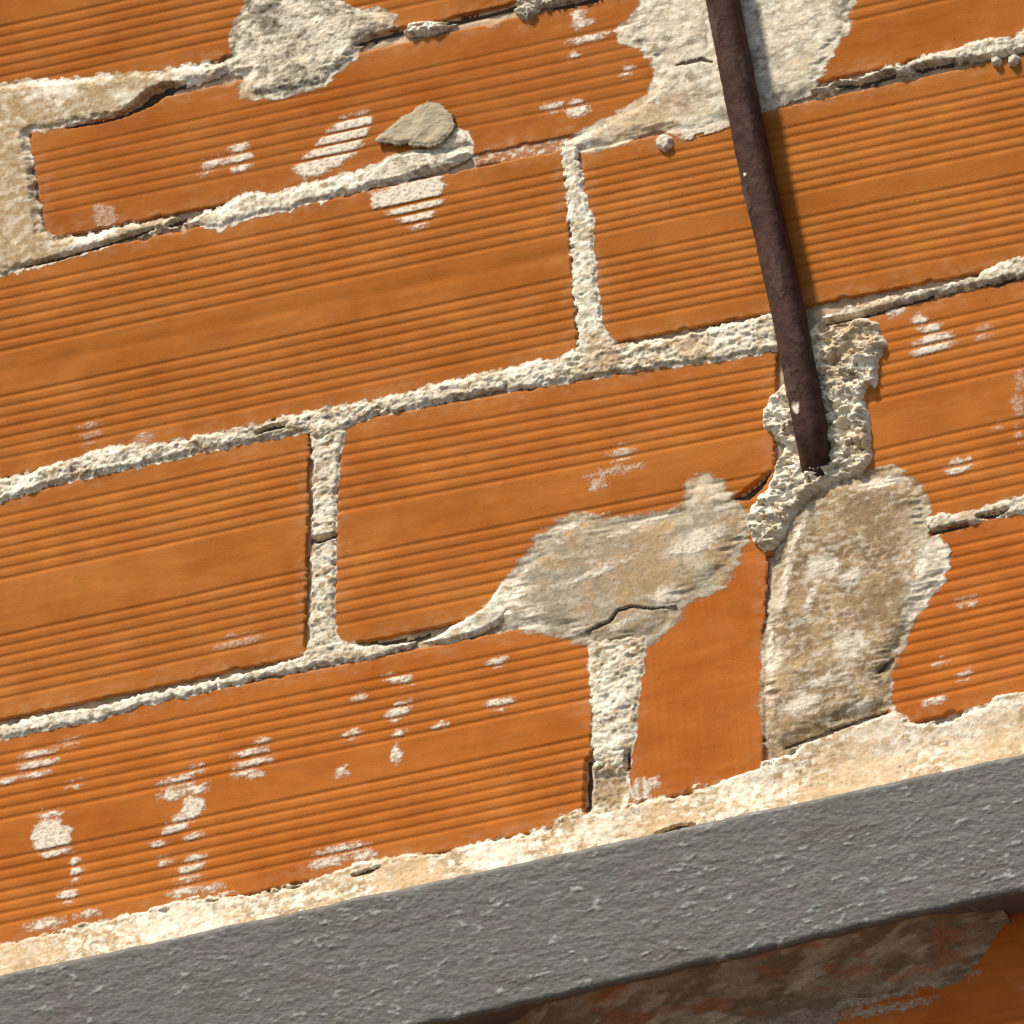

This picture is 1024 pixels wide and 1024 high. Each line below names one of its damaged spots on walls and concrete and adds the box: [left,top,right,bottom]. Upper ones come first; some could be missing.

rust [707,4,721,42]
crack [839,63,955,90]
crack [69,84,187,129]
damp [203,143,253,174]
peeling [293,101,474,228]
damp [886,308,954,356]
rust [783,363,801,403]
spalling [734,318,888,552]
crack [586,604,676,634]
damp [0,737,75,785]
damp [152,763,206,847]
damp [30,811,82,903]